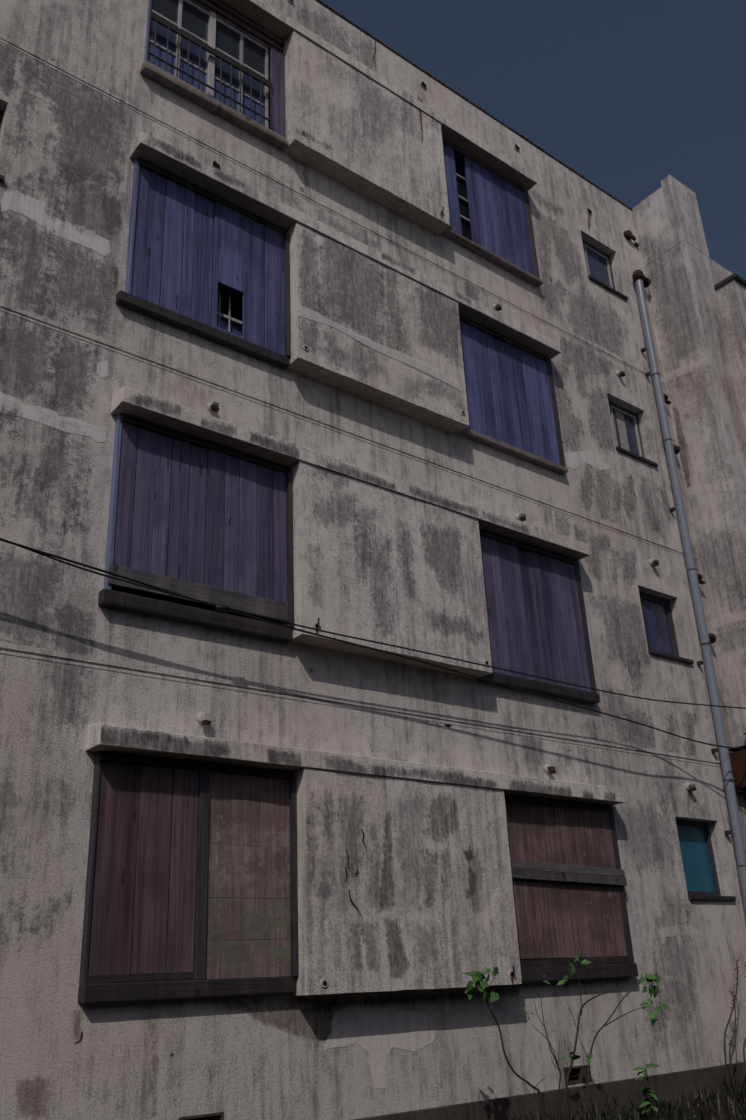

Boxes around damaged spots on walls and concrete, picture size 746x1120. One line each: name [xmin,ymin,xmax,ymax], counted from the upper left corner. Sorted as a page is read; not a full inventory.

water stain [298,229,479,373]
water stain [306,795,377,897]
crack [345,829,366,917]
water stain [385,919,408,977]
water stain [223,987,518,1039]